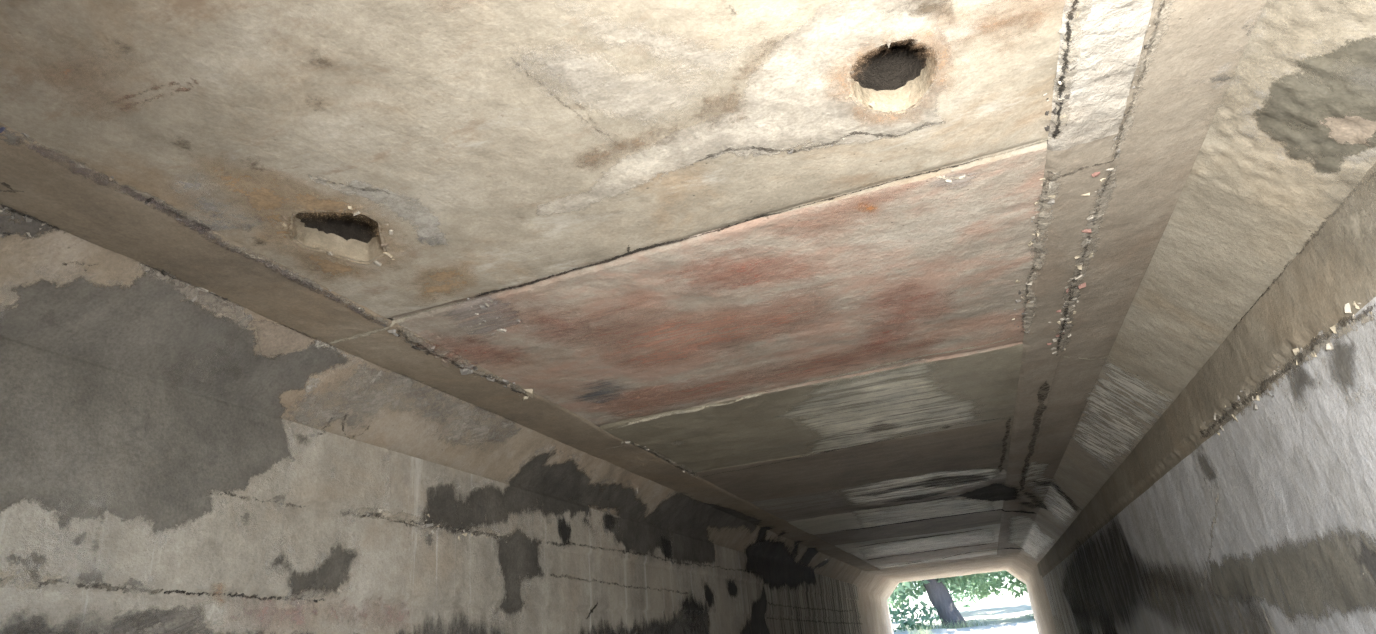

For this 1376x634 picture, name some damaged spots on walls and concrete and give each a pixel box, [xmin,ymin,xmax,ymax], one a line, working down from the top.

crack [699,121,946,161]
leakage [1210,0,1376,183]
spalling [0,204,59,239]
crack [476,157,986,297]
leakage [1072,359,1174,469]
leakage [1287,366,1314,400]
leakage [1329,342,1354,394]
crack [0,567,324,603]
leakage [403,451,831,634]
leakage [838,462,1079,561]
leakage [1198,454,1216,481]
leakage [1053,518,1376,634]